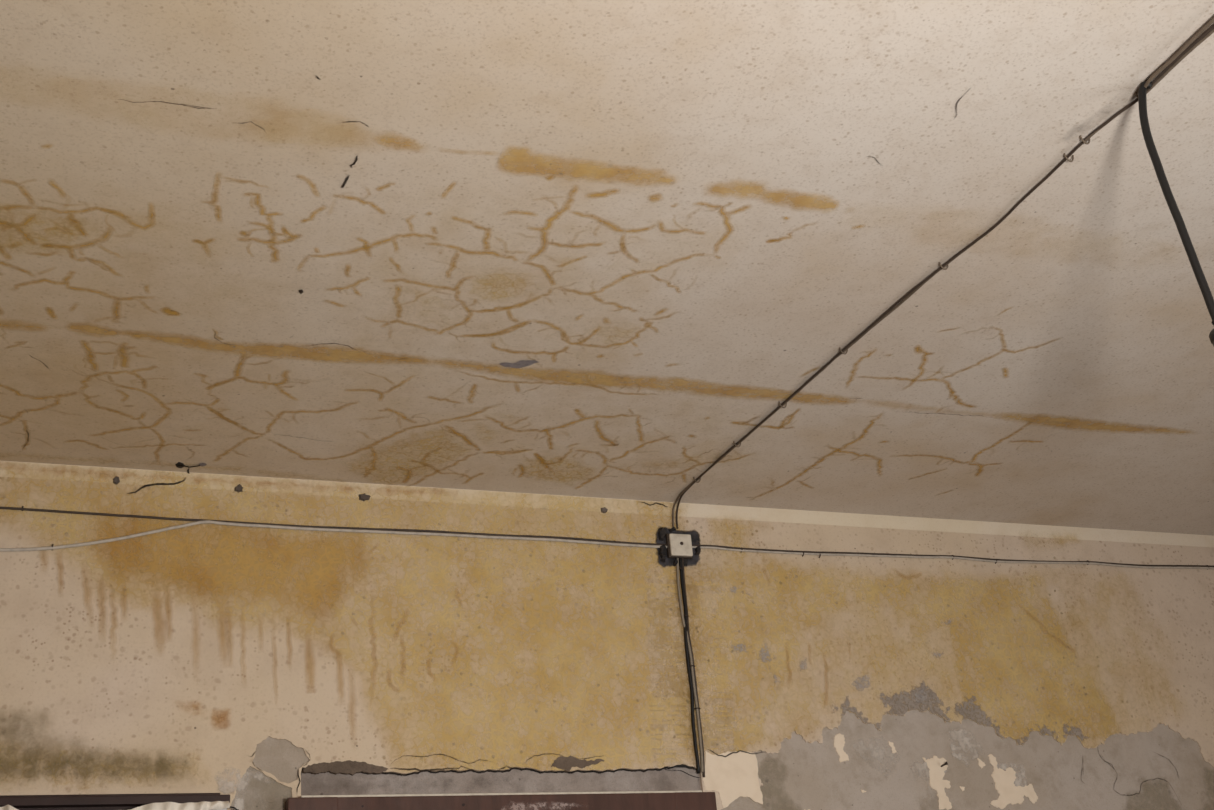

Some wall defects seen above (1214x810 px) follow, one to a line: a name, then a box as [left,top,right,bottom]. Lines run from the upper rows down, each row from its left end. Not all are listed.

crack [0,184,176,318]
crack [244,156,638,357]
water stain [500,149,672,182]
crack [526,176,689,308]
water stain [712,185,836,209]
water stain [134,334,423,363]
crack [0,338,739,507]
water stain [446,362,846,402]
crack [760,347,1041,496]
water stain [0,472,1113,770]
flaking render [218,737,388,810]
flaking render [721,675,1214,810]